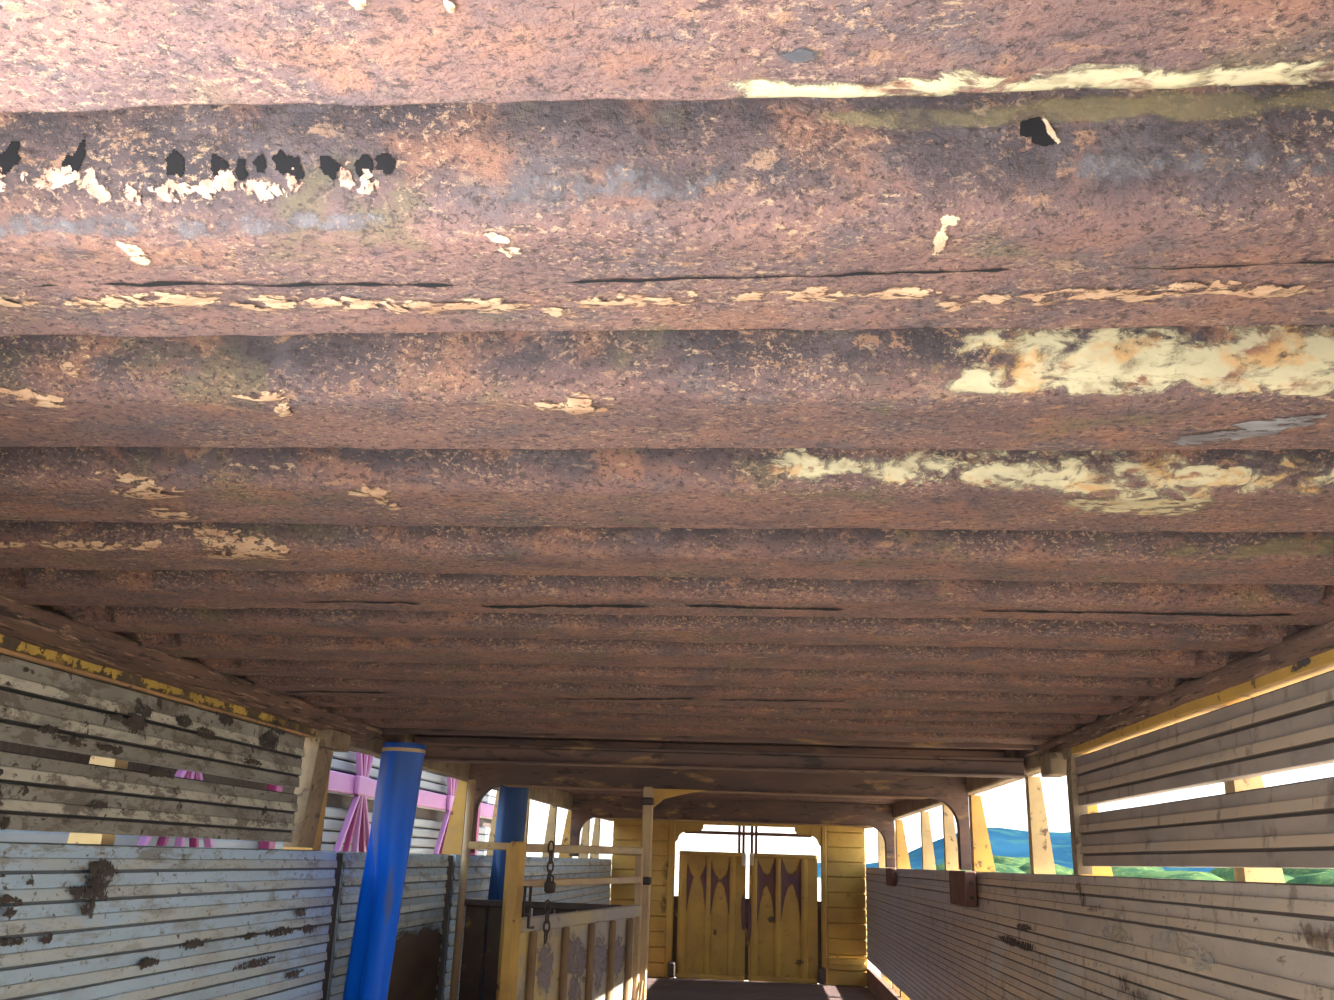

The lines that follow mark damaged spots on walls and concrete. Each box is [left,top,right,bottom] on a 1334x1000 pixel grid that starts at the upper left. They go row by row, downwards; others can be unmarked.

peeling [734,61,1334,126]
rust [0,165,305,206]
rust [339,161,380,195]
crack [104,281,458,289]
rust [0,280,1310,317]
crack [565,269,1010,284]
peeling [946,324,1334,396]
water stain [1171,414,1329,446]
peeling [769,448,1334,516]
rust [93,466,309,561]
crack [480,603,647,611]
peeling [0,634,123,680]